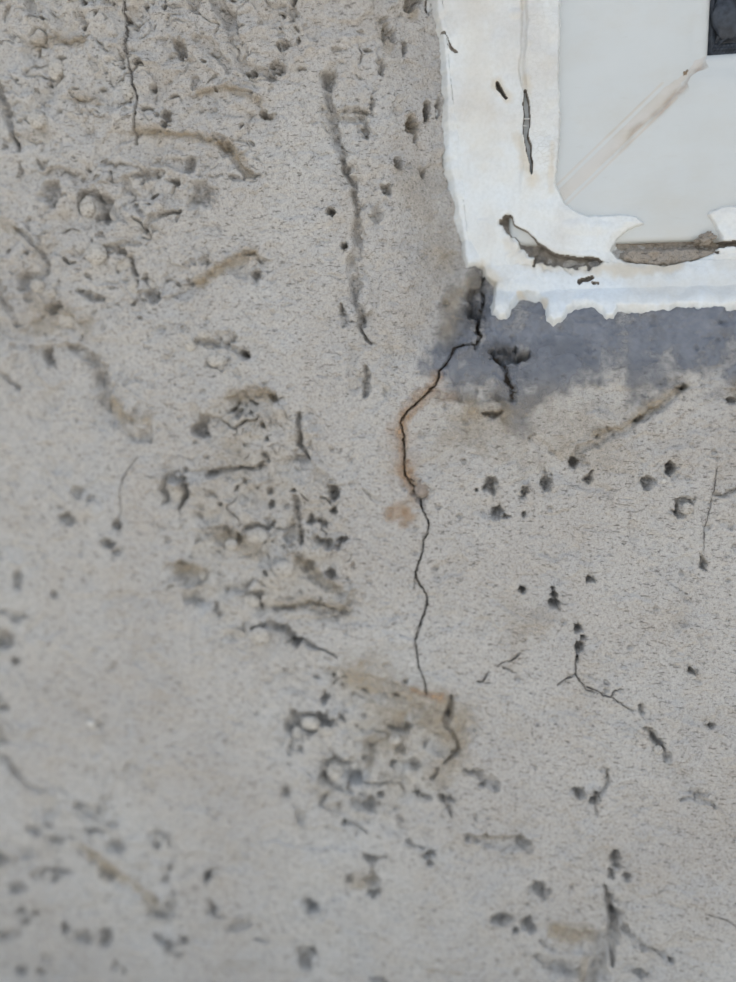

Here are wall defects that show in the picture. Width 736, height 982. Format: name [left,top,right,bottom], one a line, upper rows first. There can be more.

crack [522,89,533,174]
crack [715,240,736,254]
spalling [157,386,356,652]
crack [400,277,520,695]
crack [559,652,629,709]
spalling [280,785,291,798]
spalling [314,667,501,834]